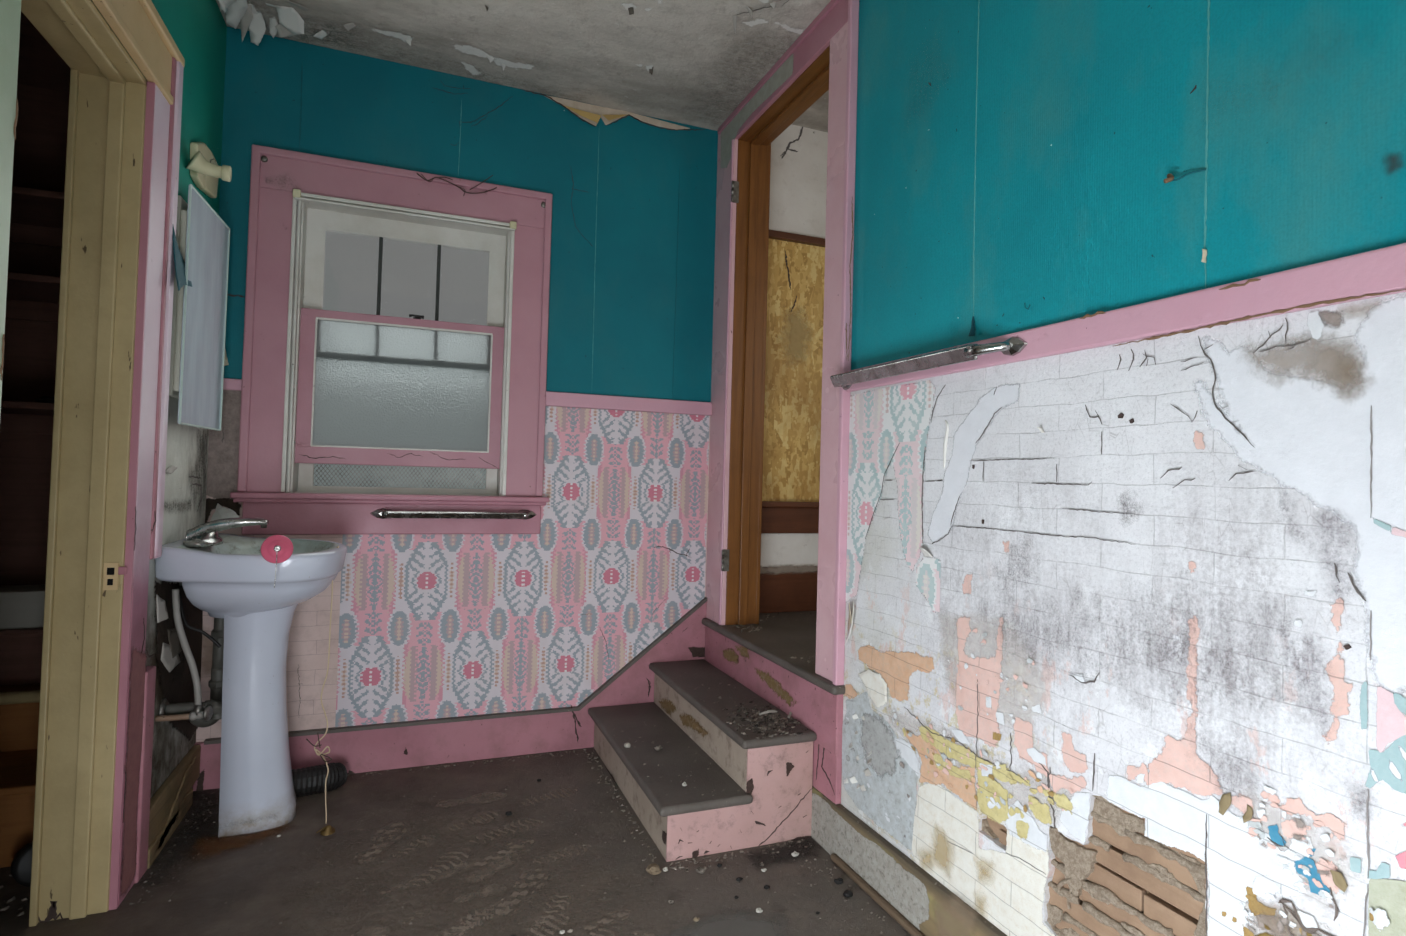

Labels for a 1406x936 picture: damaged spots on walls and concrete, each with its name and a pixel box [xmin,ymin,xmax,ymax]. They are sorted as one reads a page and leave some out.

peeling [218,0,414,46]
peeling [733,0,804,35]
peeling [452,44,535,75]
peeling [545,95,690,130]
crack [1254,318,1309,353]
peeling [1307,311,1324,339]
damp [1254,338,1356,385]
crack [1117,336,1254,481]
peeling [1193,431,1205,449]
peeling [1322,598,1353,742]
flaking render [1368,879,1406,936]